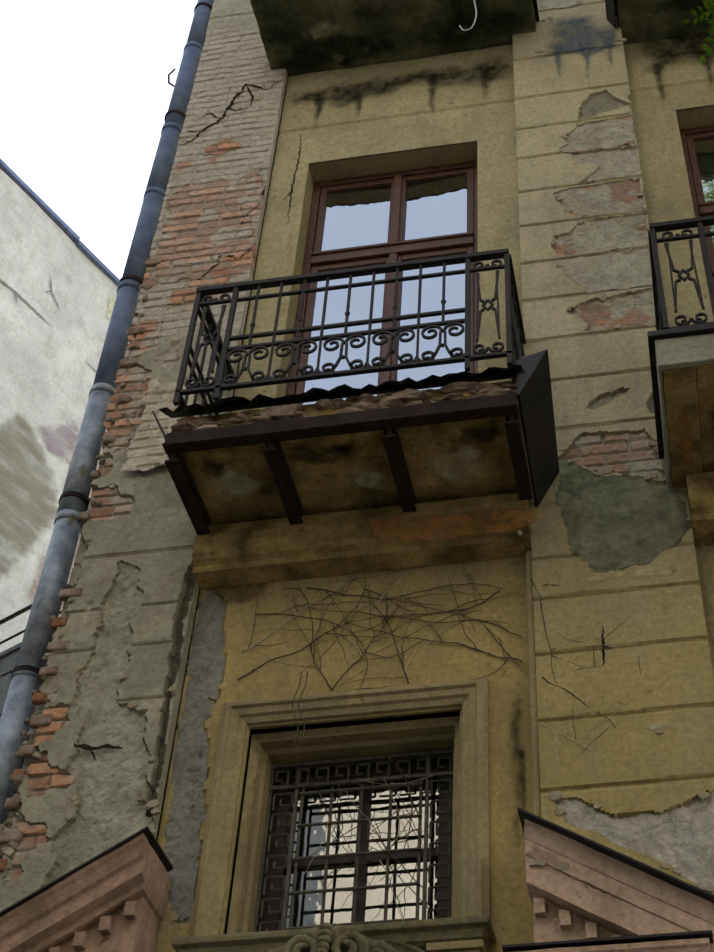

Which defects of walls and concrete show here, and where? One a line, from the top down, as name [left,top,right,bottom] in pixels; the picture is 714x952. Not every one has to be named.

crack [182,82,278,145]
leakage [283,24,390,69]
leakage [296,60,506,115]
leakage [646,32,714,93]
flaking render [204,138,242,156]
crack [285,135,302,225]
flaking render [550,92,656,331]
flaking render [0,170,265,923]
flaking render [548,791,714,892]